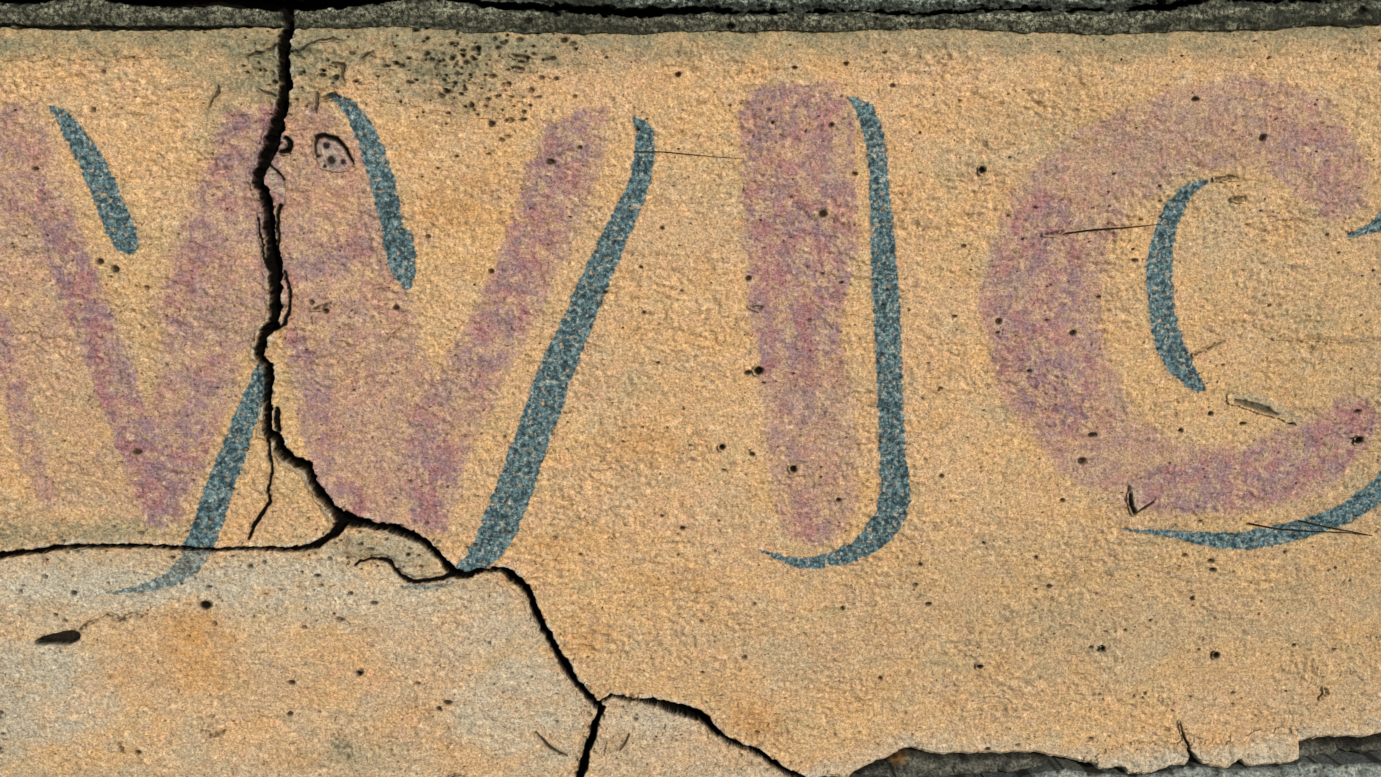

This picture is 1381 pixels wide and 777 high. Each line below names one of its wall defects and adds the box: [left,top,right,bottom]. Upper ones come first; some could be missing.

crack [594,0,1362,20]
crack [0,0,849,777]
spalling [198,599,212,613]
spalling [33,611,145,647]
peeling [534,730,569,758]
peeling [605,733,630,756]
spalling [1298,733,1381,756]
spalling [822,747,1048,777]